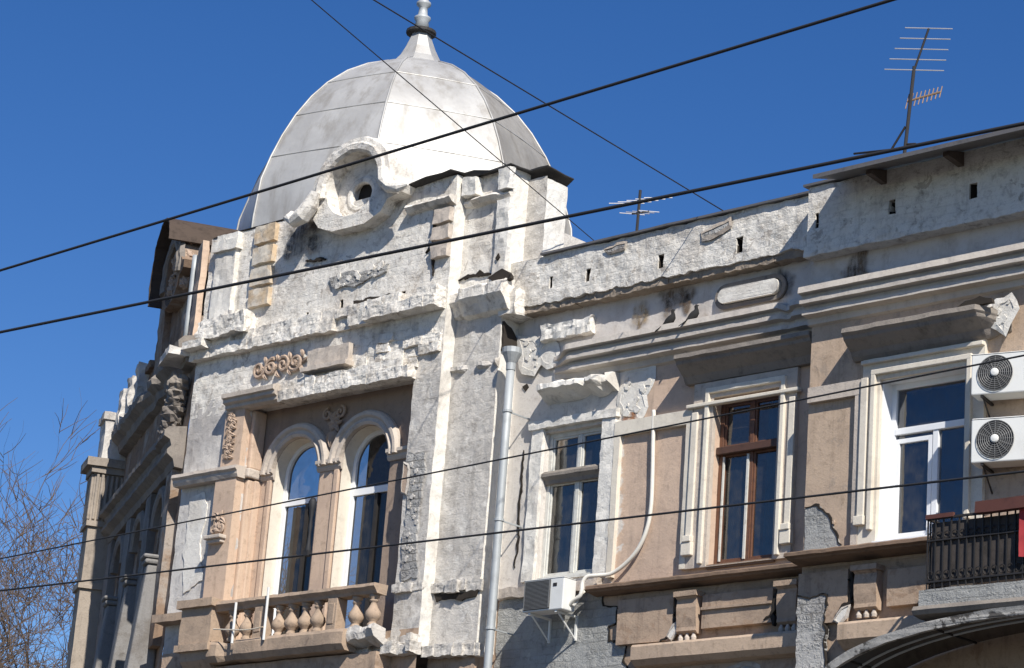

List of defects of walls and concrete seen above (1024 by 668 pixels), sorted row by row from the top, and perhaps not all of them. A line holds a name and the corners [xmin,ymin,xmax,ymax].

water stain [662,288,694,316]
flaking render [987,292,1020,337]
peeling [617,366,656,419]
crack [513,450,524,568]
flaking render [804,503,842,550]
flaking render [795,593,852,668]